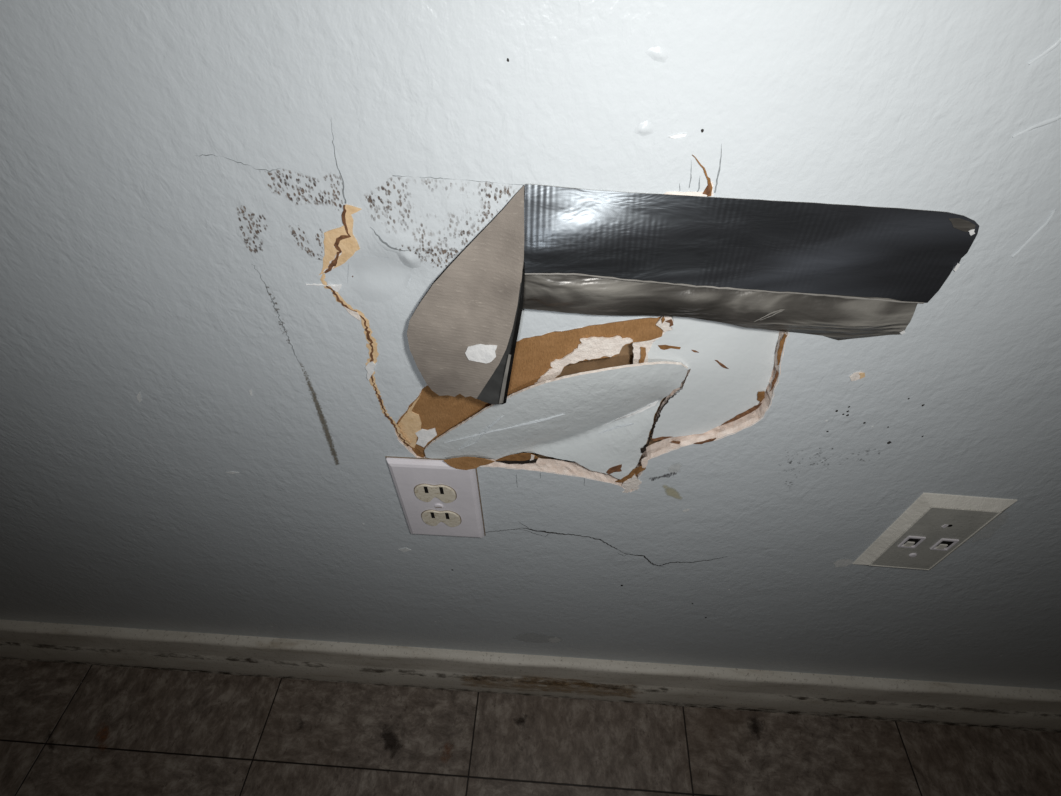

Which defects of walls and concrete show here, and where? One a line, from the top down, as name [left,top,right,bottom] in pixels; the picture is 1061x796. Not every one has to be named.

peeling [319,204,361,275]
spalling [507,316,673,396]
spalling [394,385,491,458]
spalling [444,331,789,493]
crack [486,524,720,567]